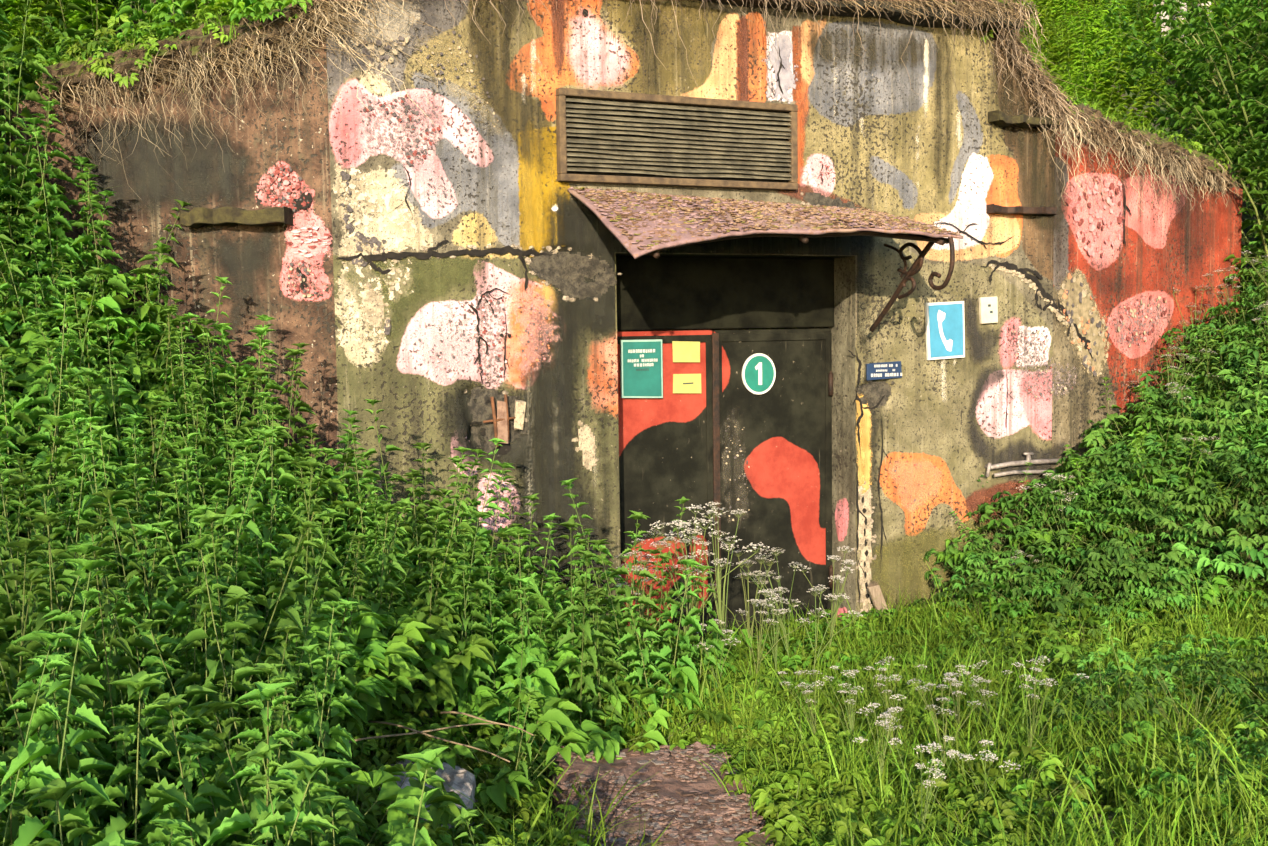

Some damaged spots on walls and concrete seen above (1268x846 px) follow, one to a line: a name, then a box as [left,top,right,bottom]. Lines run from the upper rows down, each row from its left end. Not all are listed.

corrosion [739,16,748,101]
leakage [75,117,251,214]
leakage [210,226,275,326]
crack [931,222,1093,369]
spalling [414,247,622,456]